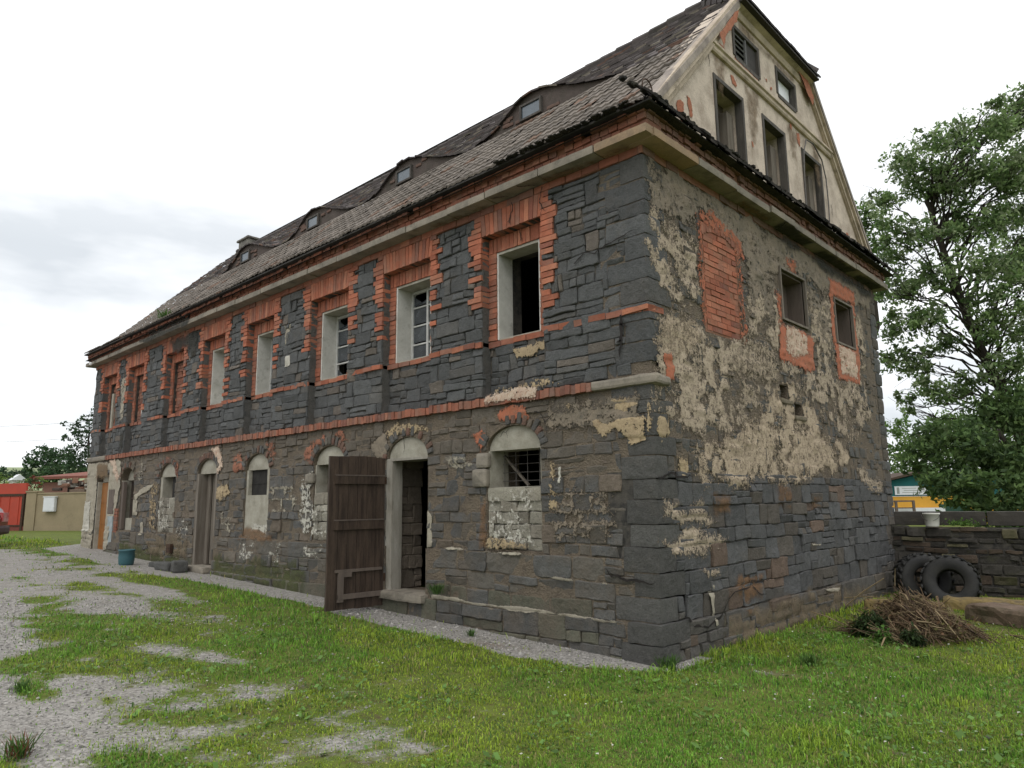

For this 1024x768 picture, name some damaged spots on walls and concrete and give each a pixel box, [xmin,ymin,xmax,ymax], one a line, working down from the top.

flaking render [484,155,883,579]
flaking render [80,459,121,551]
flaking render [207,446,243,533]
flaking render [270,430,348,559]